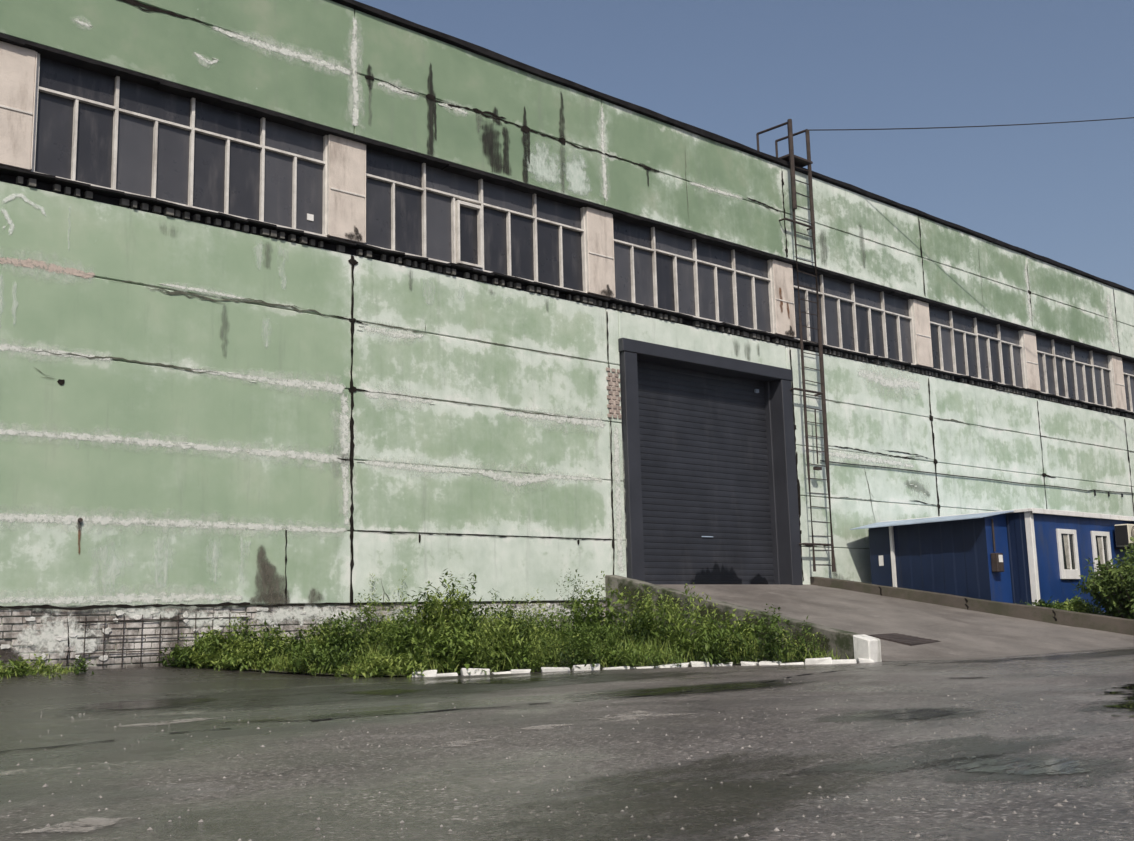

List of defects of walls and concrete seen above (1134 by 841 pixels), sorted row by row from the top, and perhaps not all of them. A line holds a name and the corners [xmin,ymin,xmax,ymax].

crack [121,0,215,29]
water stain [427,63,437,156]
water stain [478,93,590,195]
water stain [240,542,289,605]
flaking render [0,585,369,661]